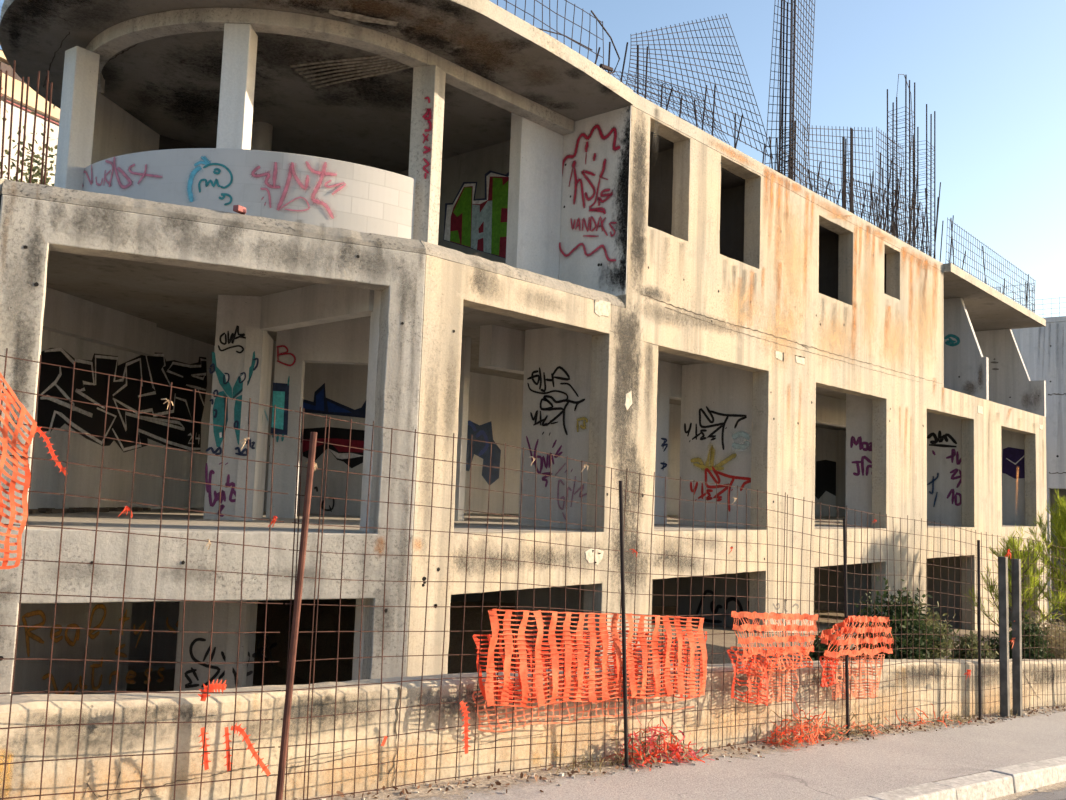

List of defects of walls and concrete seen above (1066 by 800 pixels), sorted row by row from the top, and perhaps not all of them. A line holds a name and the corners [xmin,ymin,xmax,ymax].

damp [163,46,223,126]
damp [257,38,412,108]
damp [606,129,646,288]
rust [765,171,797,213]
rust [854,226,882,275]
rust [902,249,936,305]
damp [47,718,148,749]
damp [277,696,373,729]